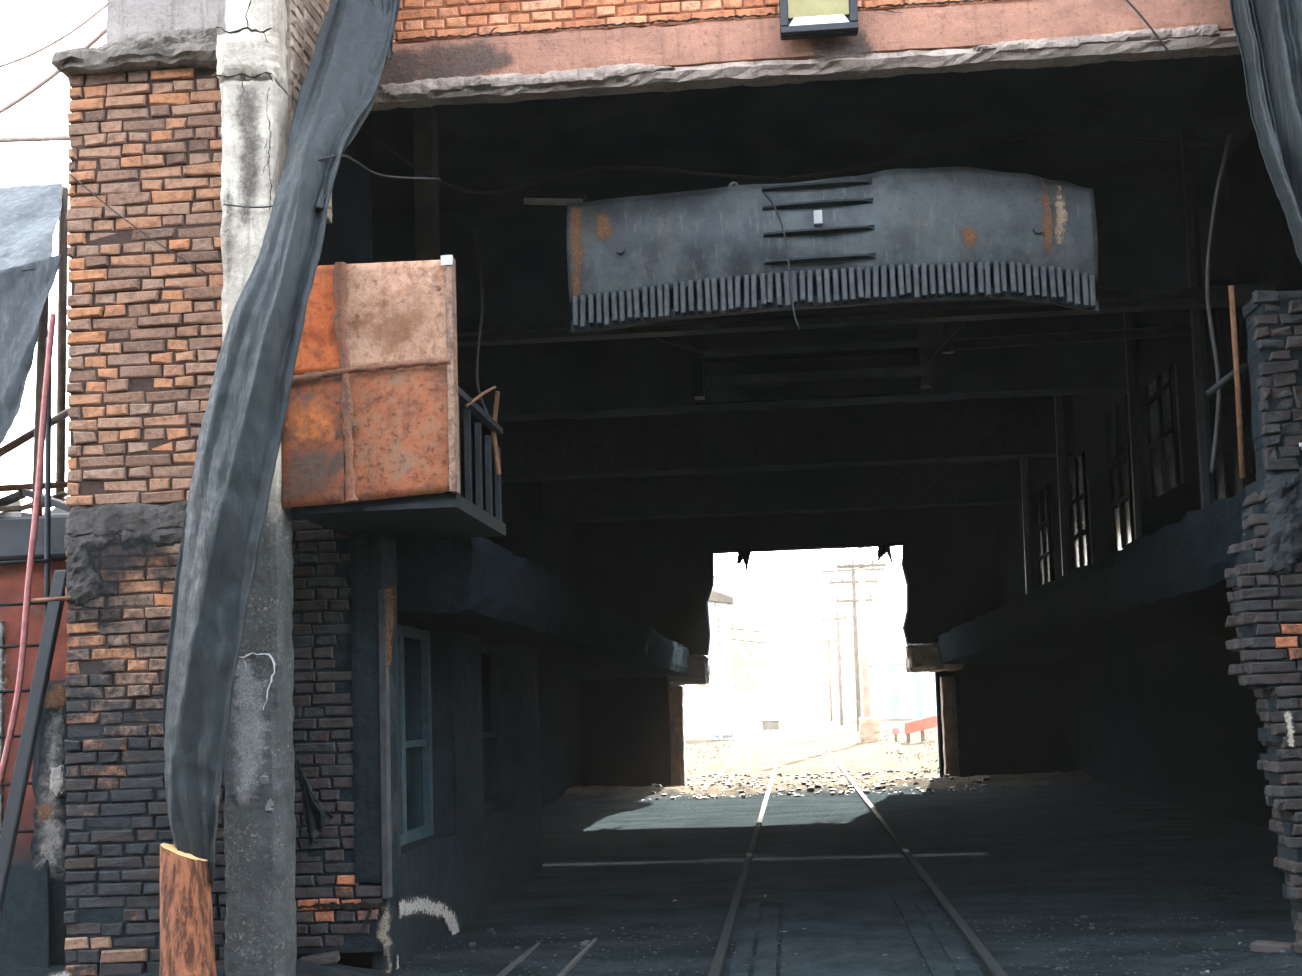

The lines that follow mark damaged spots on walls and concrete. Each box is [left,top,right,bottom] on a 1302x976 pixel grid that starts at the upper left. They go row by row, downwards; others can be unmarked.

damp [378,41,512,90]
crack [215,0,273,210]
rust [570,208,612,297]
rust [1042,180,1068,254]
rust [287,405,333,440]